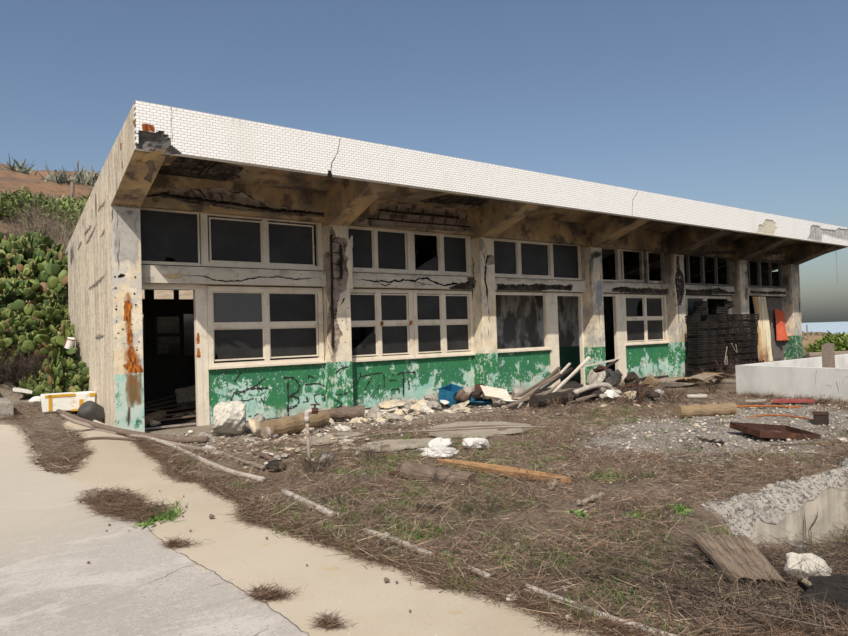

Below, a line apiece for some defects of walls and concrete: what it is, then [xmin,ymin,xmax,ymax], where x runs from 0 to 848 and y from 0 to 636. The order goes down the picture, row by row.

spalling [136,130,325,218]
crack [147,189,323,214]
peeling [756,219,777,236]
peeling [807,225,848,242]
crack [185,274,320,282]
spalling [323,226,349,362]
crack [361,246,490,342]
spalling [596,256,734,307]
rust [123,293,143,426]
peeling [356,385,424,407]